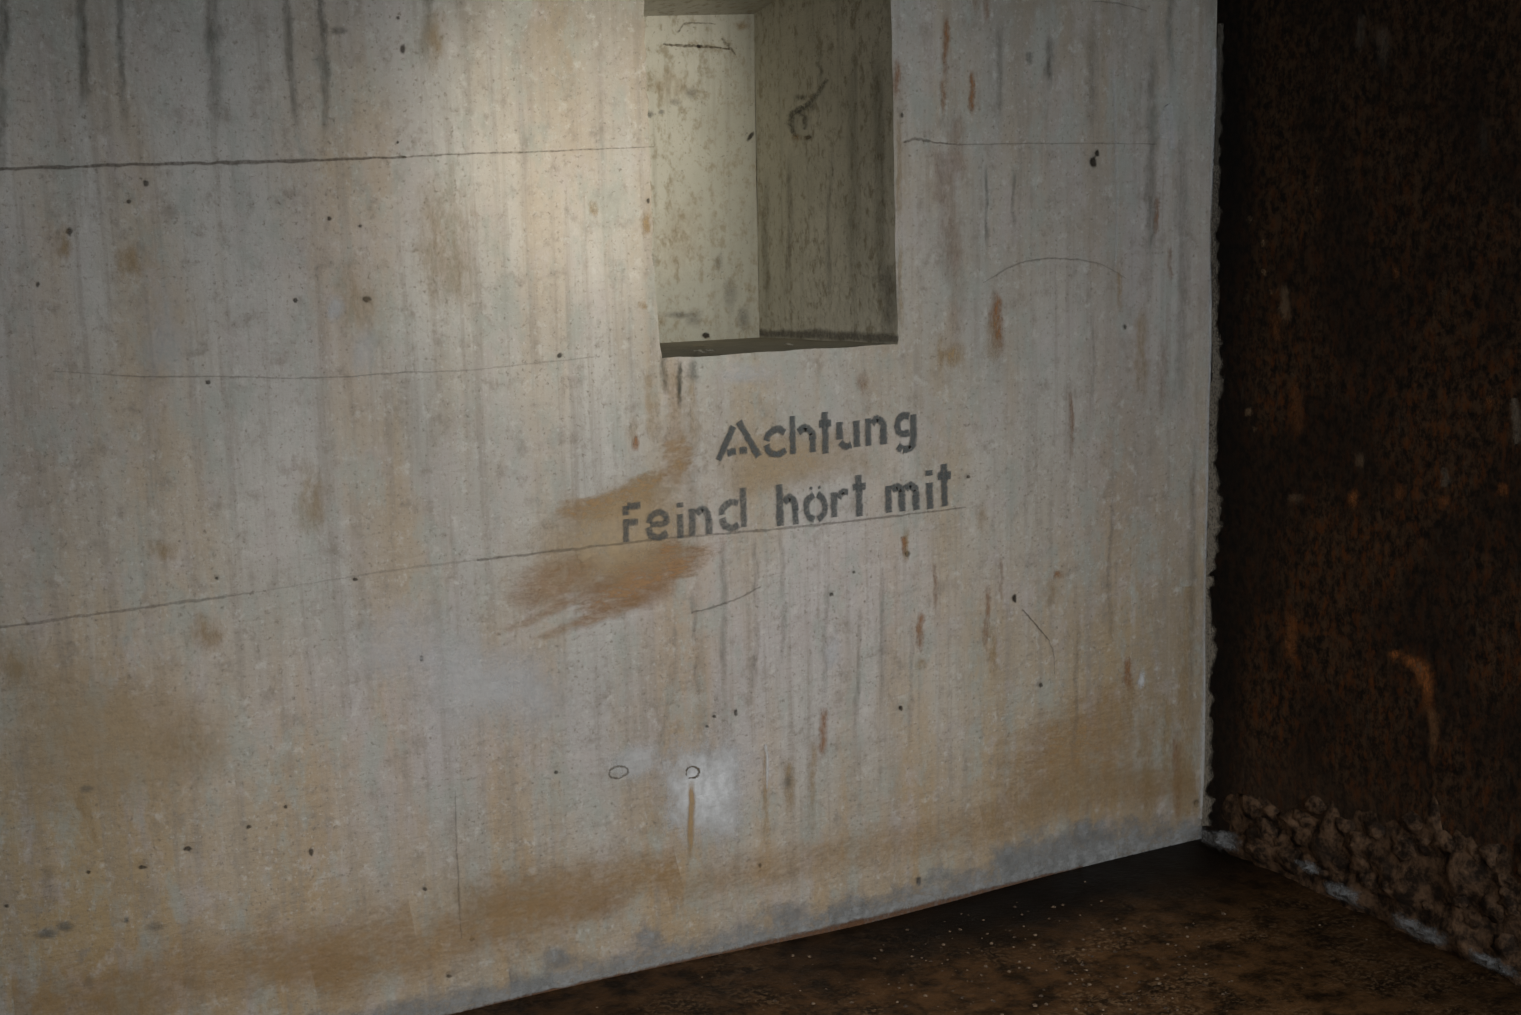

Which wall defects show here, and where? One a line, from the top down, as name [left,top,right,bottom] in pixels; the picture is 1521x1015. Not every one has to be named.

damp [625,749,739,833]
damp [1294,861,1357,905]
damp [373,820,1236,1015]
damp [1394,915,1446,944]
damp [1469,949,1511,975]